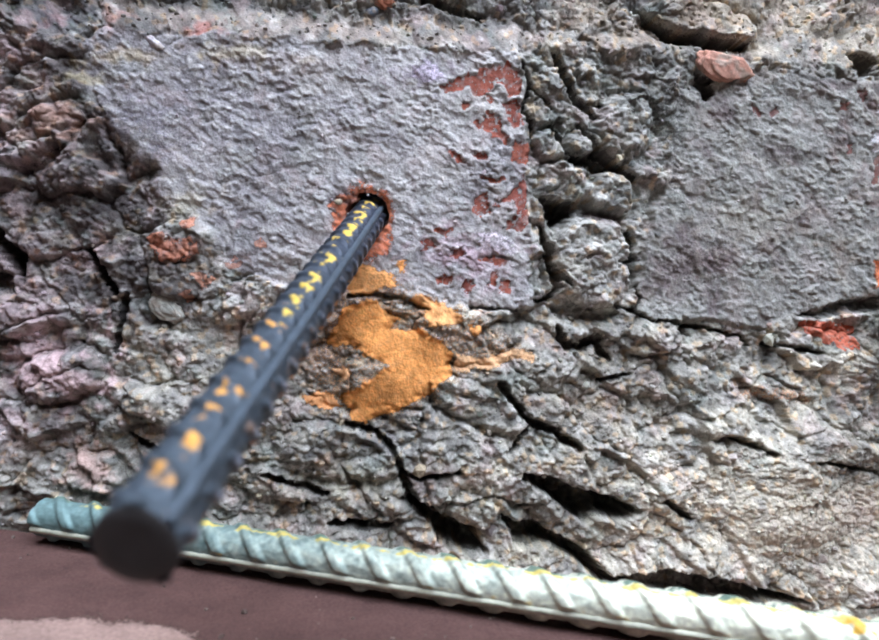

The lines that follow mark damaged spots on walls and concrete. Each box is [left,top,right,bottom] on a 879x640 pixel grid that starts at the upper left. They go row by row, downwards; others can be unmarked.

spalling [144,35,165,51]
peeling [440,60,530,232]
crack [520,52,635,184]
spalling [0,227,30,277]
crack [470,225,573,313]
crack [613,230,823,355]
crack [555,325,629,382]
crack [344,421,464,500]
spalling [27,181,879,640]
crack [497,381,583,453]
crack [727,436,778,458]
crack [664,500,691,519]